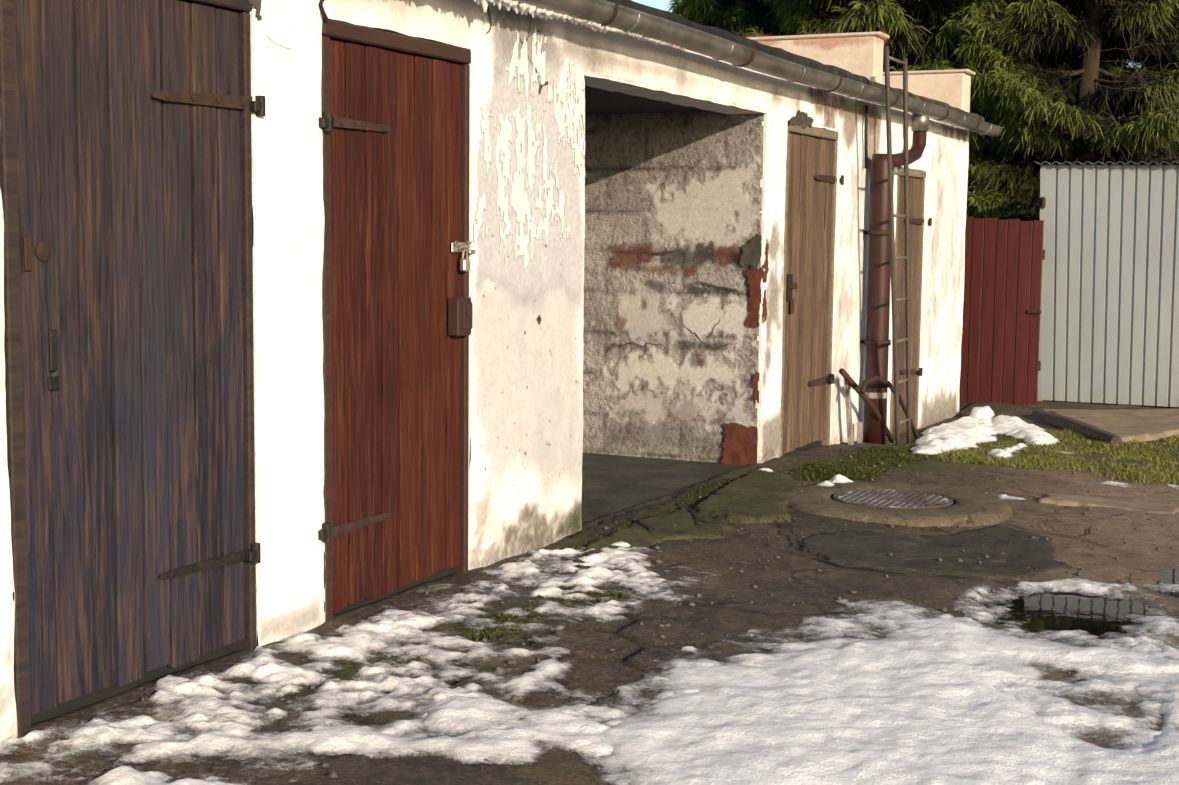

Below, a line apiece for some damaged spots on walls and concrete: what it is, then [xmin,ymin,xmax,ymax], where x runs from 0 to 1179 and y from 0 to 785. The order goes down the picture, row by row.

peeling [474,10,586,477]
peeling [604,229,783,404]
water stain [506,505,552,549]
flaking render [721,423,758,466]